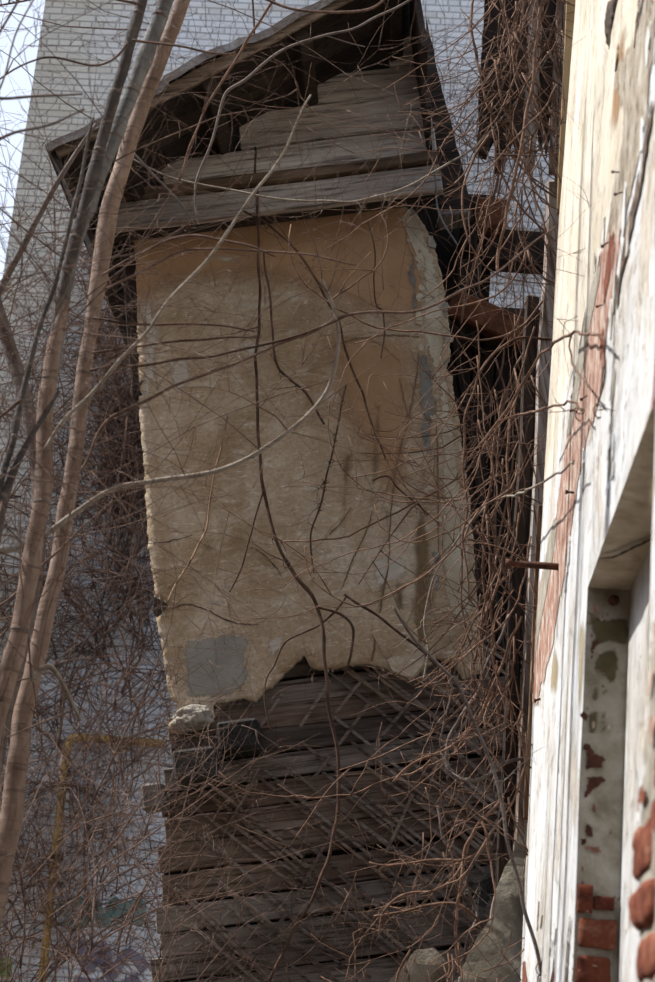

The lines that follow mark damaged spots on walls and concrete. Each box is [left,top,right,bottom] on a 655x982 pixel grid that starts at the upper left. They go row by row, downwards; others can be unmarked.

spalling [532,0,655,706]
spalling [372,651,424,678]
spalling [583,744,606,813]
spalling [628,623,655,982]
spalling [581,824,601,854]
spalling [522,928,557,982]
spalling [571,867,618,982]